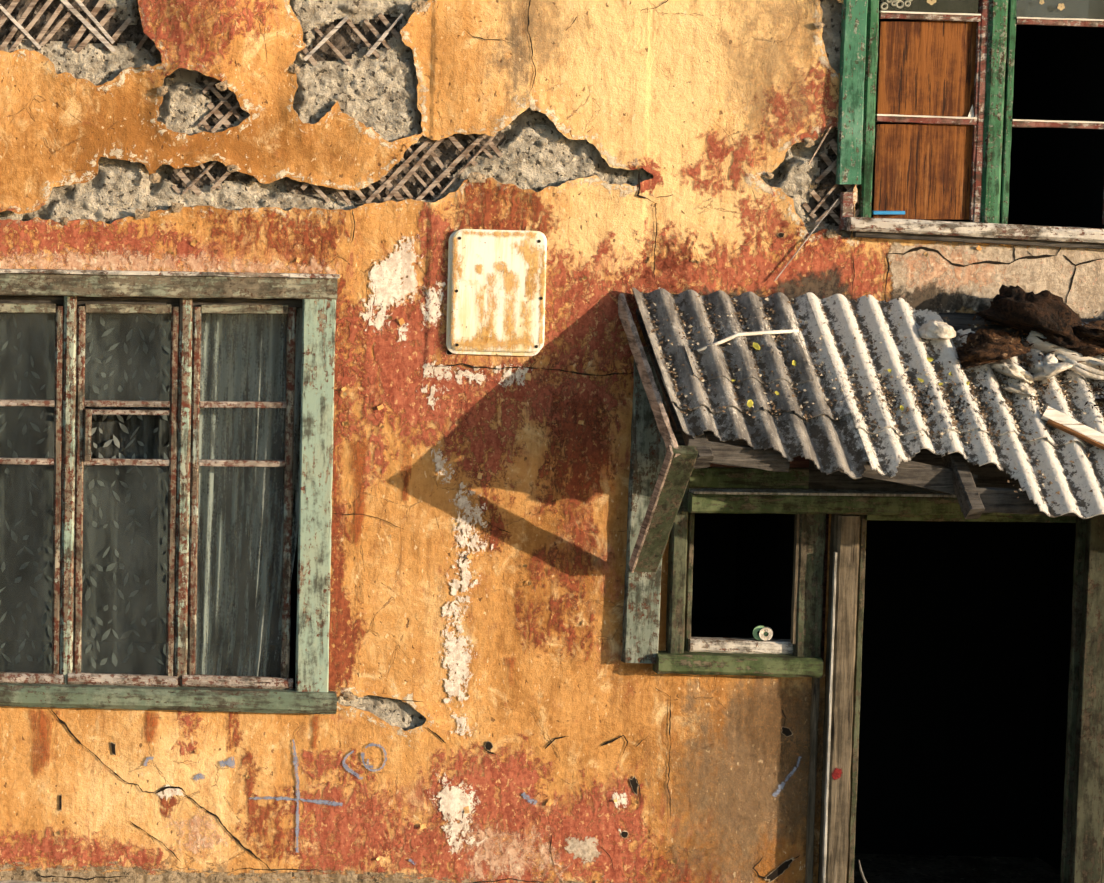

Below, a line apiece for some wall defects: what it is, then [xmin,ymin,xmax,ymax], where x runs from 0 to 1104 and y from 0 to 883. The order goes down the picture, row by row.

flaking render [0,0,278,142]
corrosion [451,231,546,351]
peeling [591,232,616,263]
crack [885,245,1101,303]
peeling [328,450,426,737]
peeling [171,711,203,757]
peeling [226,712,243,752]
peeling [450,708,476,739]
crack [51,710,321,873]
peeling [0,733,723,883]
crack [39,873,123,881]
crack [474,835,555,883]